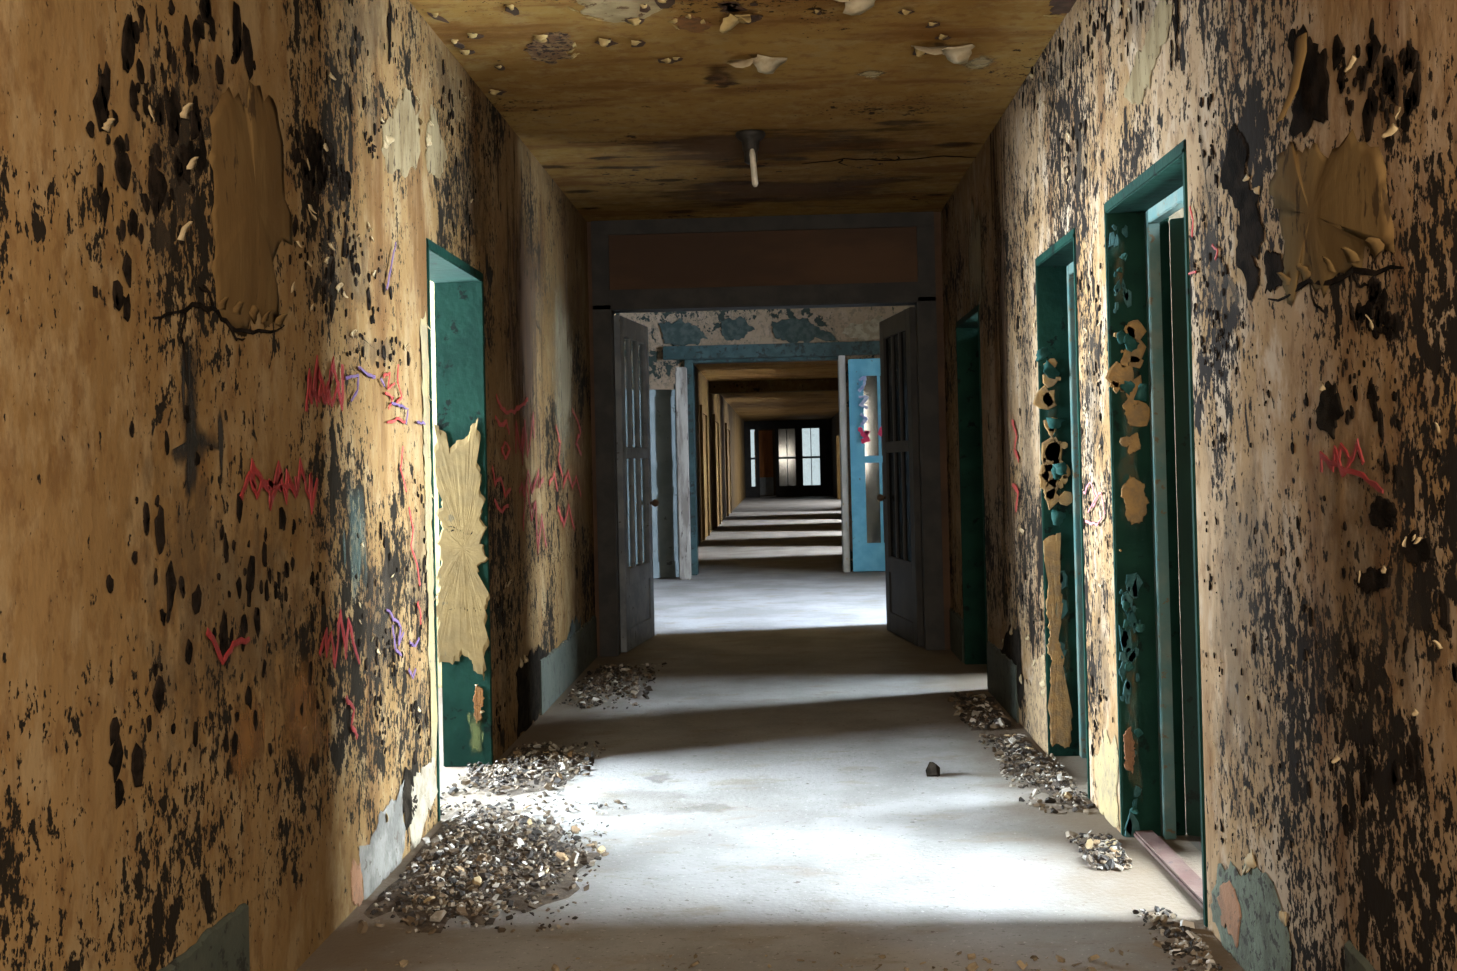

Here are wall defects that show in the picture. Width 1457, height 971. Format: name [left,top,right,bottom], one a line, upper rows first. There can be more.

peeling [556,0,675,47]
peeling [718,1,763,33]
peeling [727,54,787,74]
peeling [814,0,875,16]
peeling [898,9,993,69]
peeling [1276,18,1422,143]
peeling [135,495,202,626]
peeling [212,492,296,757]
peeling [289,120,581,907]
peeling [1000,225,1150,754]
peeling [109,663,198,809]
flaking render [1210,798,1293,971]